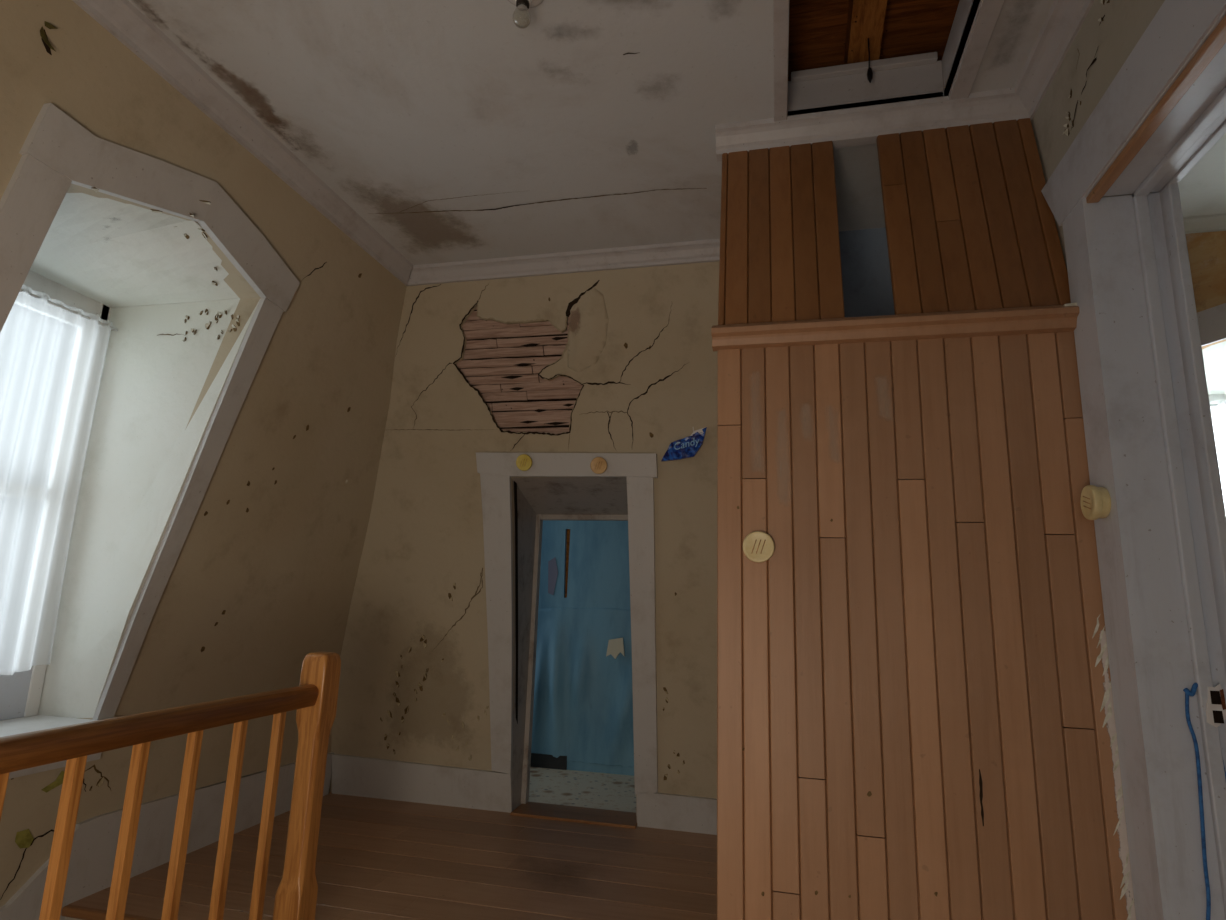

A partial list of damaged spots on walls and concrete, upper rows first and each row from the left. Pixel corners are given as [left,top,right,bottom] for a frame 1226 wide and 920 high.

peeling [40,21,58,55]
damp [213,65,281,135]
crack [397,284,441,348]
crack [566,280,599,317]
crack [394,363,452,430]
spalling [453,300,584,436]
crack [583,305,684,448]